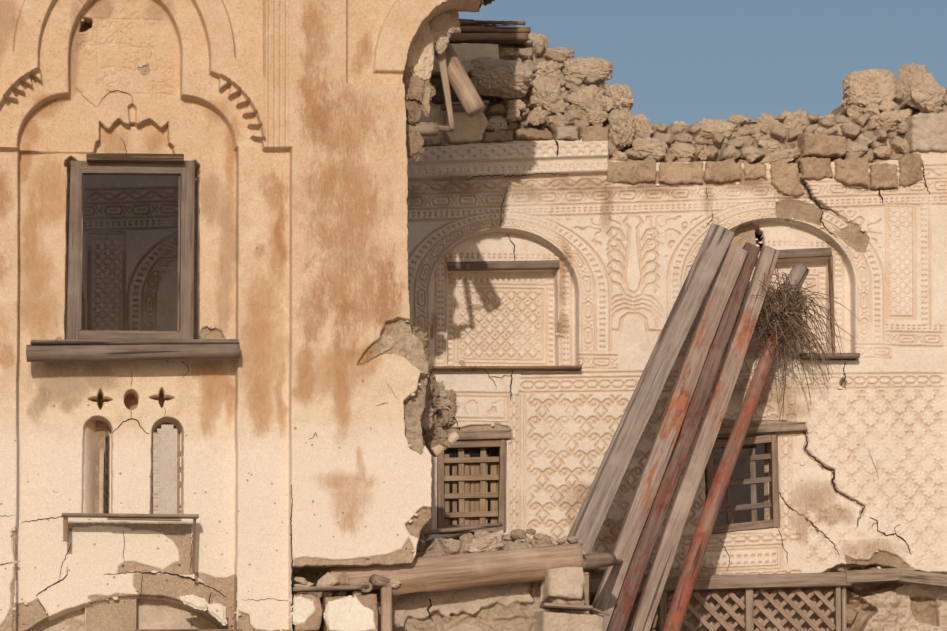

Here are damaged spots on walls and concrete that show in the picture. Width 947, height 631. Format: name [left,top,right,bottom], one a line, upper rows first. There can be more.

crack [468,138,568,261]
crack [798,167,839,237]
spalling [358,319,512,457]
crack [36,544,71,612]
flaking render [68,522,261,631]
crack [104,485,294,627]
flaking render [280,594,377,631]
crack [779,492,873,567]
crack [804,431,911,554]
spalling [825,550,911,573]
flaking render [846,581,905,631]
flaking render [910,597,939,626]